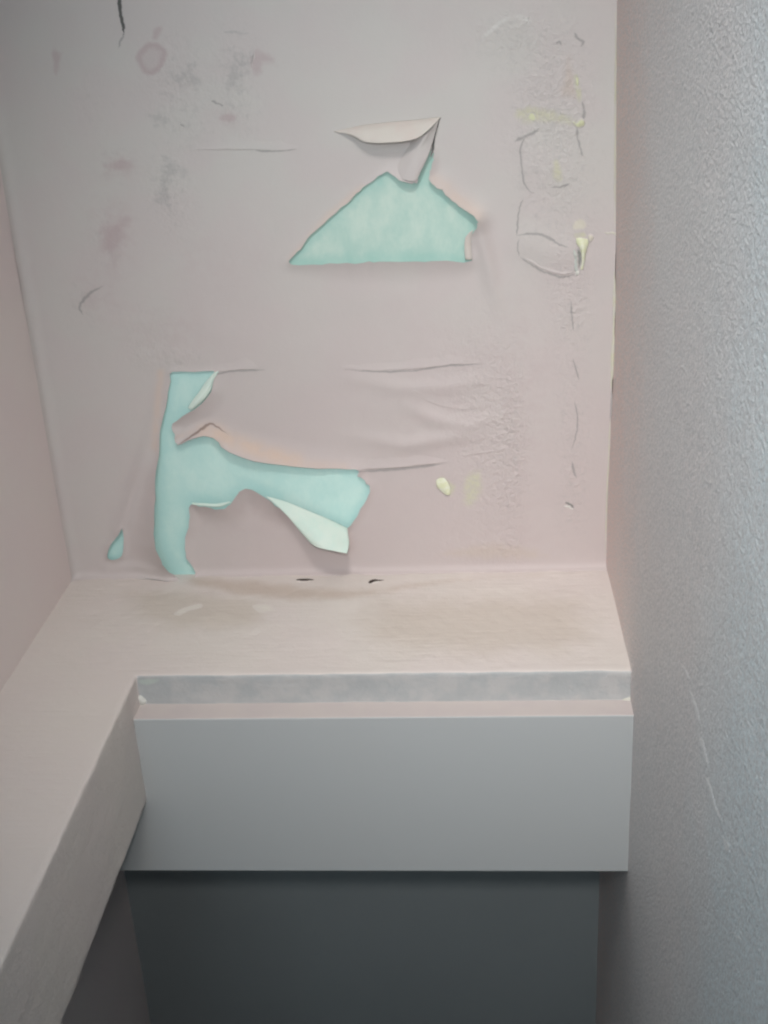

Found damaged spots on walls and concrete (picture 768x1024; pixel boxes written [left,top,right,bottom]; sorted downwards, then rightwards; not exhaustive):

crack [116,0,126,48]
peeling [281,117,495,280]
crack [515,127,570,235]
crack [575,101,587,156]
crack [77,285,104,315]
crack [571,359,579,478]
peeling [128,366,378,582]